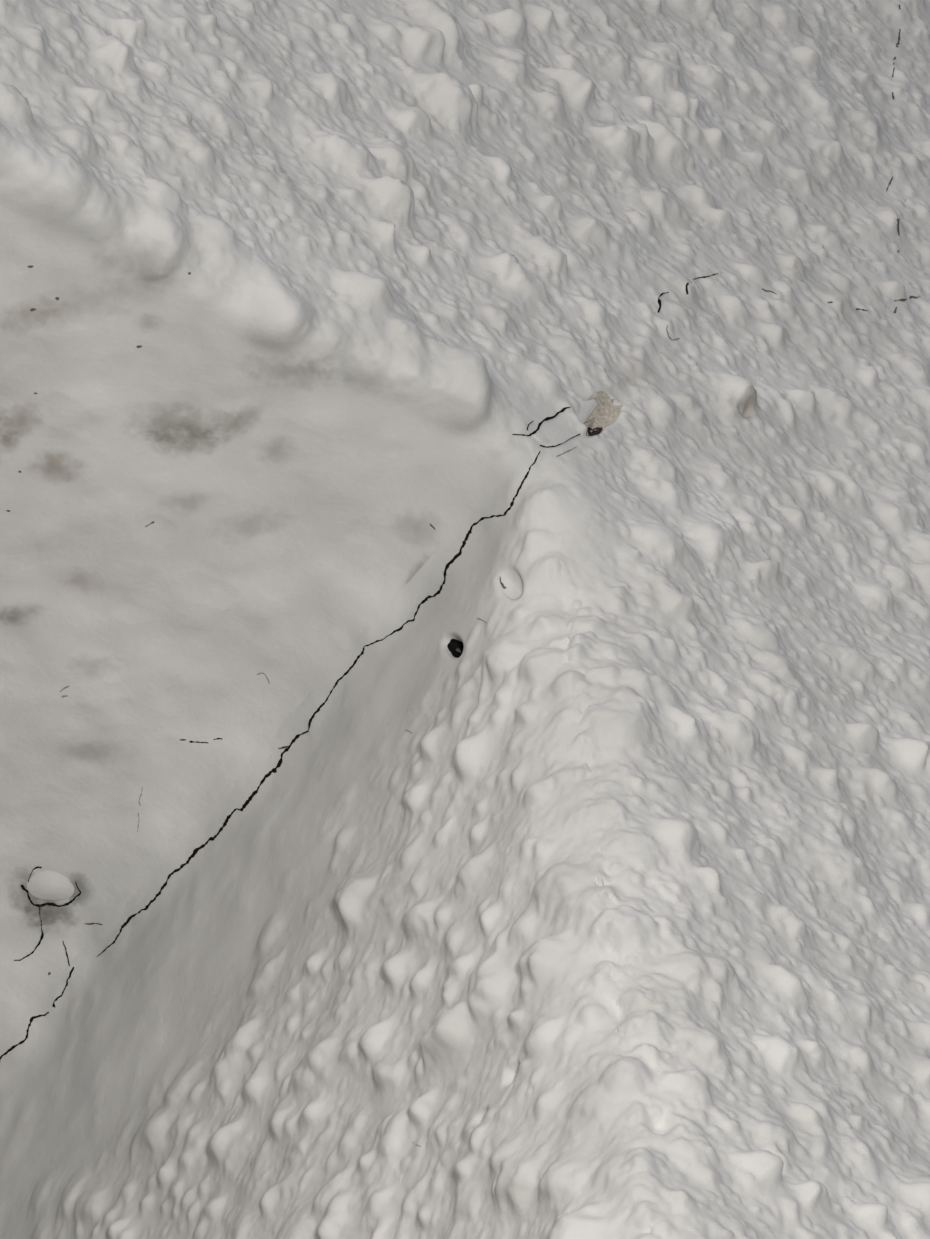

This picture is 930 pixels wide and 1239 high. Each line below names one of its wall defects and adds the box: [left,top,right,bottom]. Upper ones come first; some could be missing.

crack [0,407,581,1060]